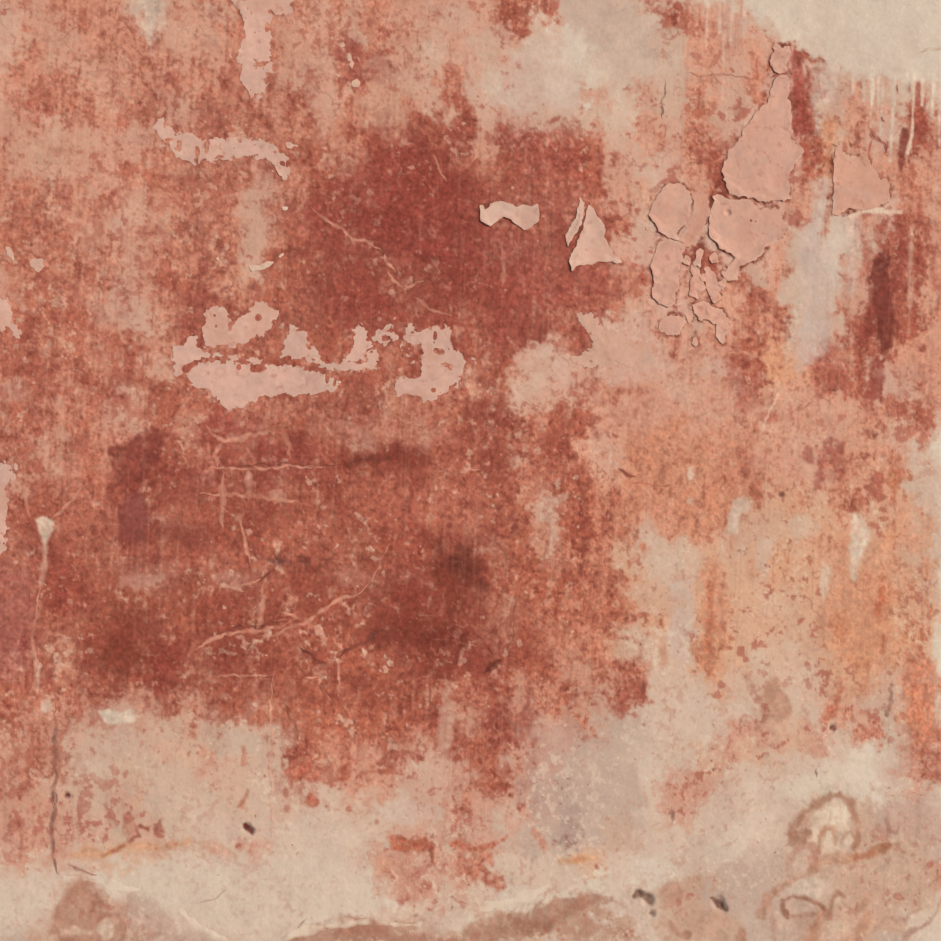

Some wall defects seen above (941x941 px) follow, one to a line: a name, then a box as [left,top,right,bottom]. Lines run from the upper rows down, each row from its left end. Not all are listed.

peeling [229,0,299,100]
peeling [152,117,298,181]
peeling [476,196,543,236]
peeling [558,37,804,426]
peeling [825,142,896,218]
peeling [0,297,22,339]
peeling [171,301,476,412]
flaking render [806,330,865,411]
peeling [0,460,18,555]
crack [438,465,480,473]
crack [192,425,401,696]
crack [217,673,301,842]